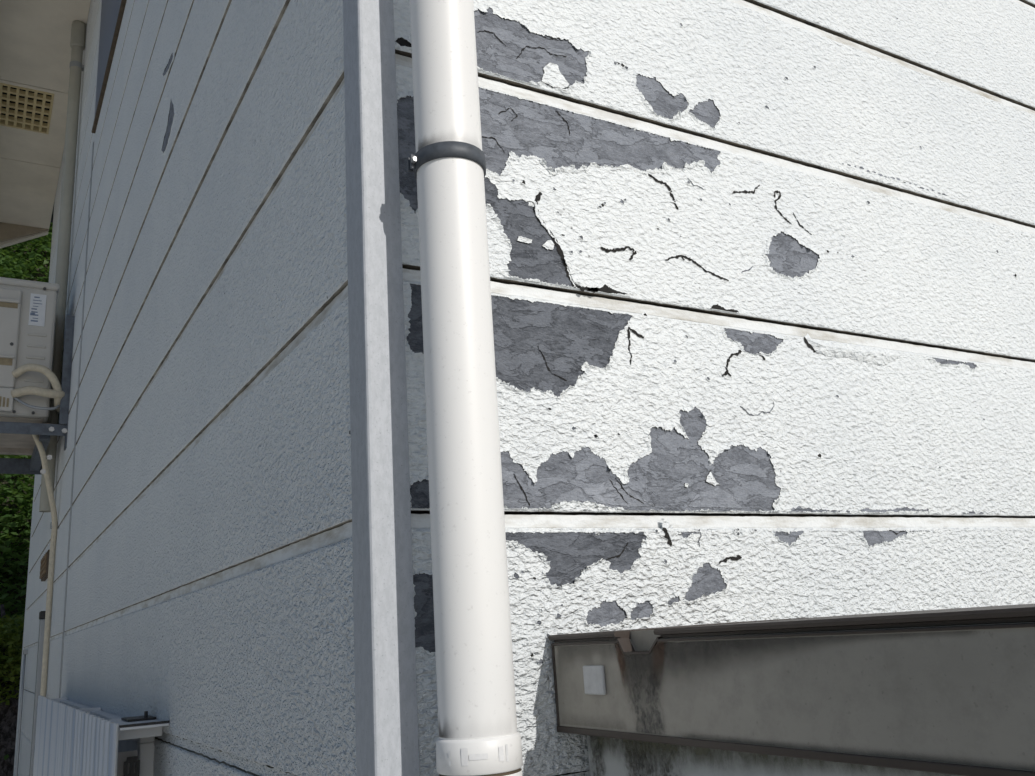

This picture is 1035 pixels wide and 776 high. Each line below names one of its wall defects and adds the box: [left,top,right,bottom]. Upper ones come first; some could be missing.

peeling [474,6,593,95]
peeling [478,86,722,289]
crack [648,169,812,235]
crack [601,241,638,260]
crack [664,251,753,281]
peeling [762,228,855,281]
peeling [491,295,648,412]
crack [628,324,645,364]
crack [720,345,766,377]
peeling [500,404,929,514]
peeling [505,528,659,627]
water stain [623,636,829,776]